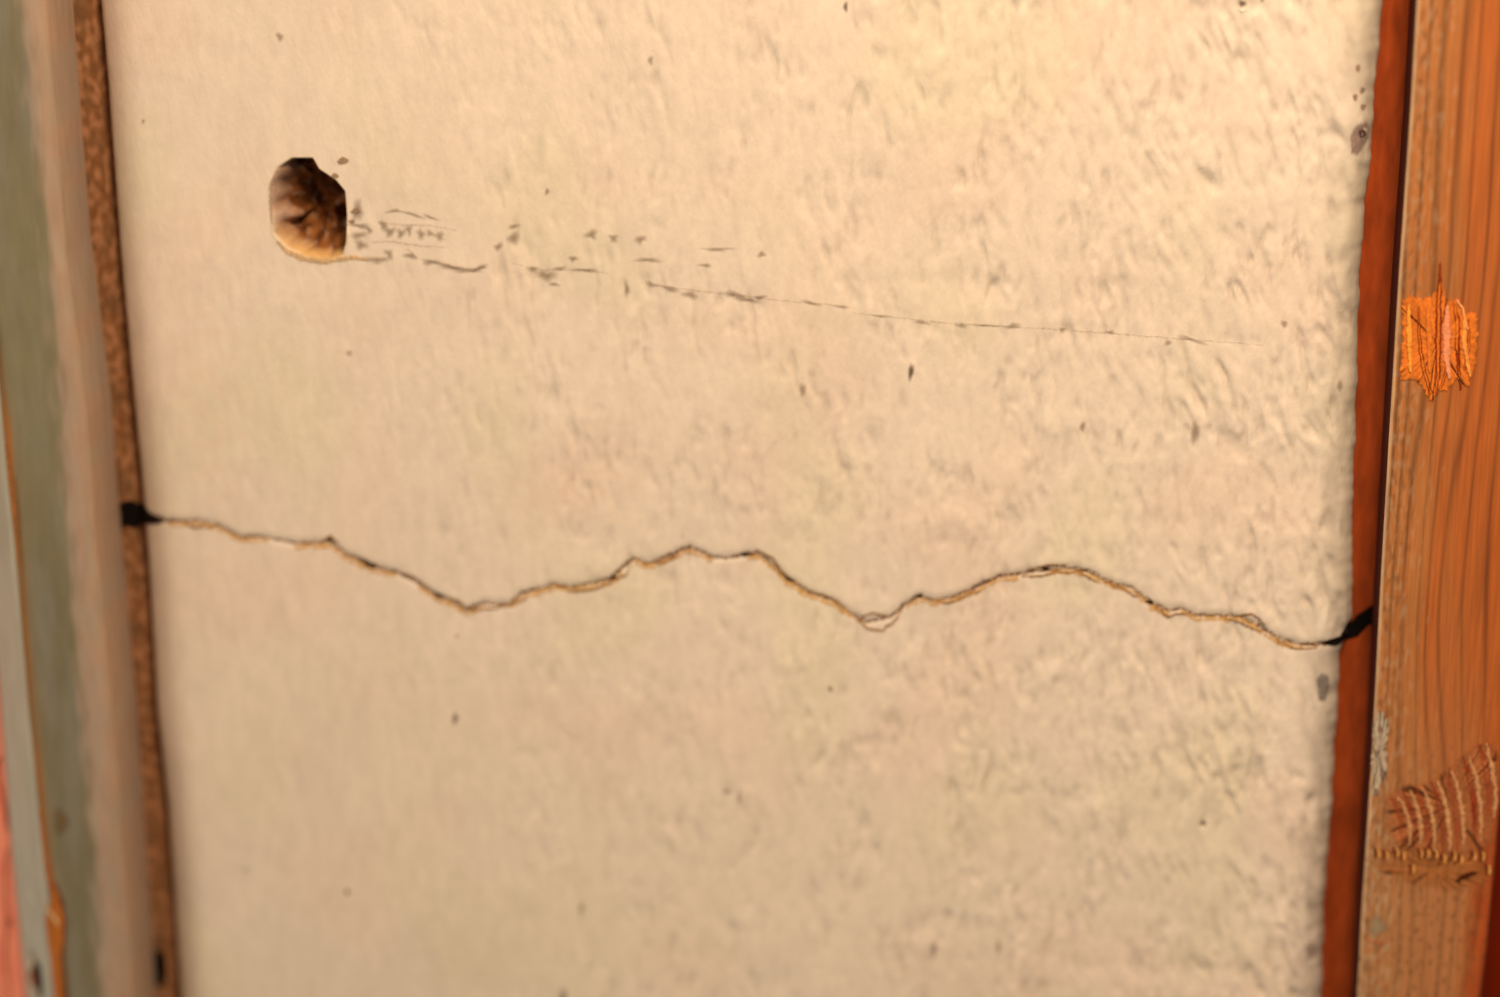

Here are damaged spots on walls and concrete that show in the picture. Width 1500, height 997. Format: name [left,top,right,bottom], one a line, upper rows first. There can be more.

crack [119,500,1373,649]